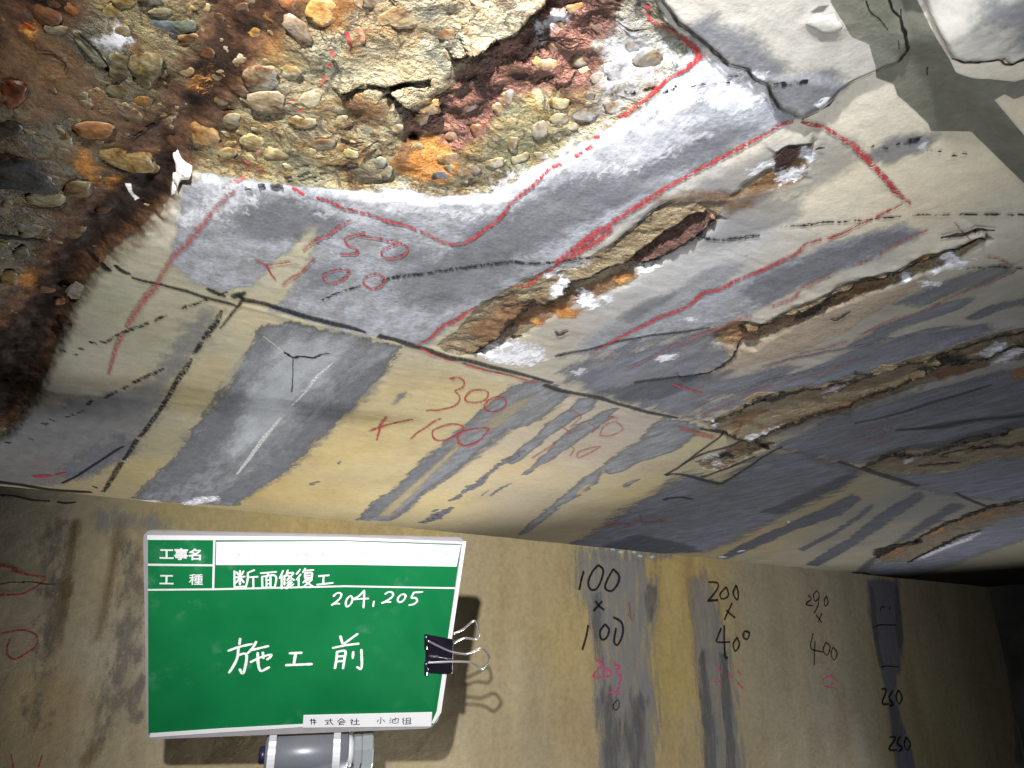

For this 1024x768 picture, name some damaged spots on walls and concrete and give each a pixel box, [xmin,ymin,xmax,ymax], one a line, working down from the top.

spalling [0,0,724,437]
leakage [132,51,798,506]
corrosion [391,0,621,184]
spalling [736,144,825,196]
spalling [679,228,995,378]
crack [865,0,928,75]
leakage [0,314,209,485]
spalling [696,328,1024,469]
leakage [571,369,1024,768]
spalling [874,498,1024,563]